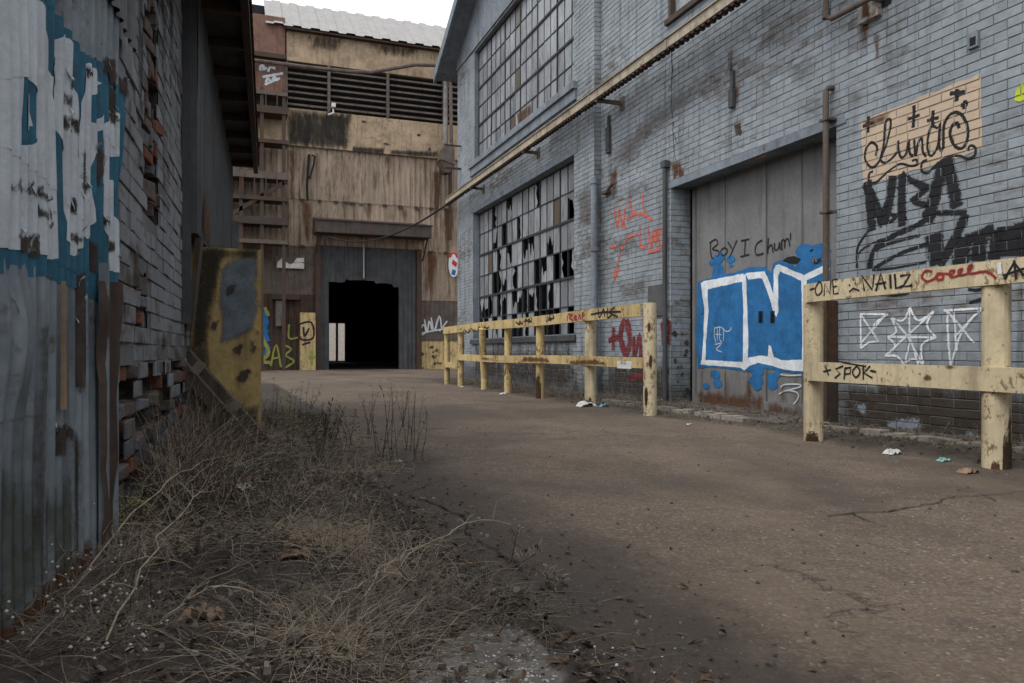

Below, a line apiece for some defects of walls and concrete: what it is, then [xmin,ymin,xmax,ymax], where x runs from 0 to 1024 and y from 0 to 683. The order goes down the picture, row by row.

peeling [63,57,130,133]
spalling [139,0,164,226]
leakage [288,108,438,157]
peeling [70,142,108,214]
peeling [11,177,54,258]
peeling [211,257,257,355]
peeling [236,369,251,382]
corrosion [699,383,796,414]
crack [828,491,1016,526]